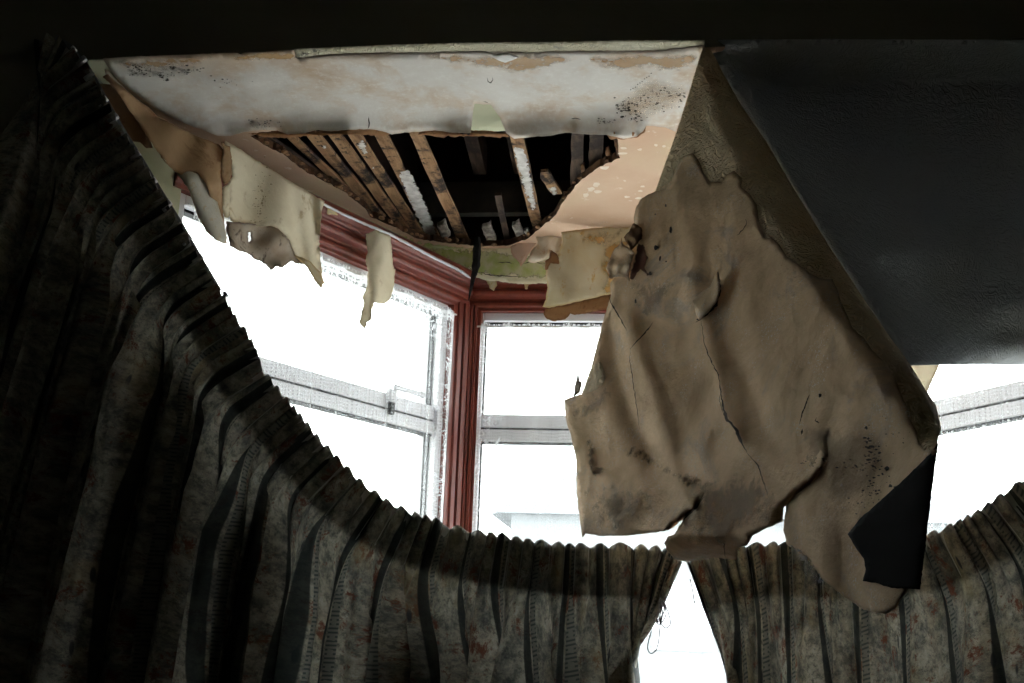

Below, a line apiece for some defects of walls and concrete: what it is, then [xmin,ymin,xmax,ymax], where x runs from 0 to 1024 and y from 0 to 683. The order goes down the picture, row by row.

leakage [591,56,694,124]
peeling [523,177,582,263]
crack [702,326,768,495]